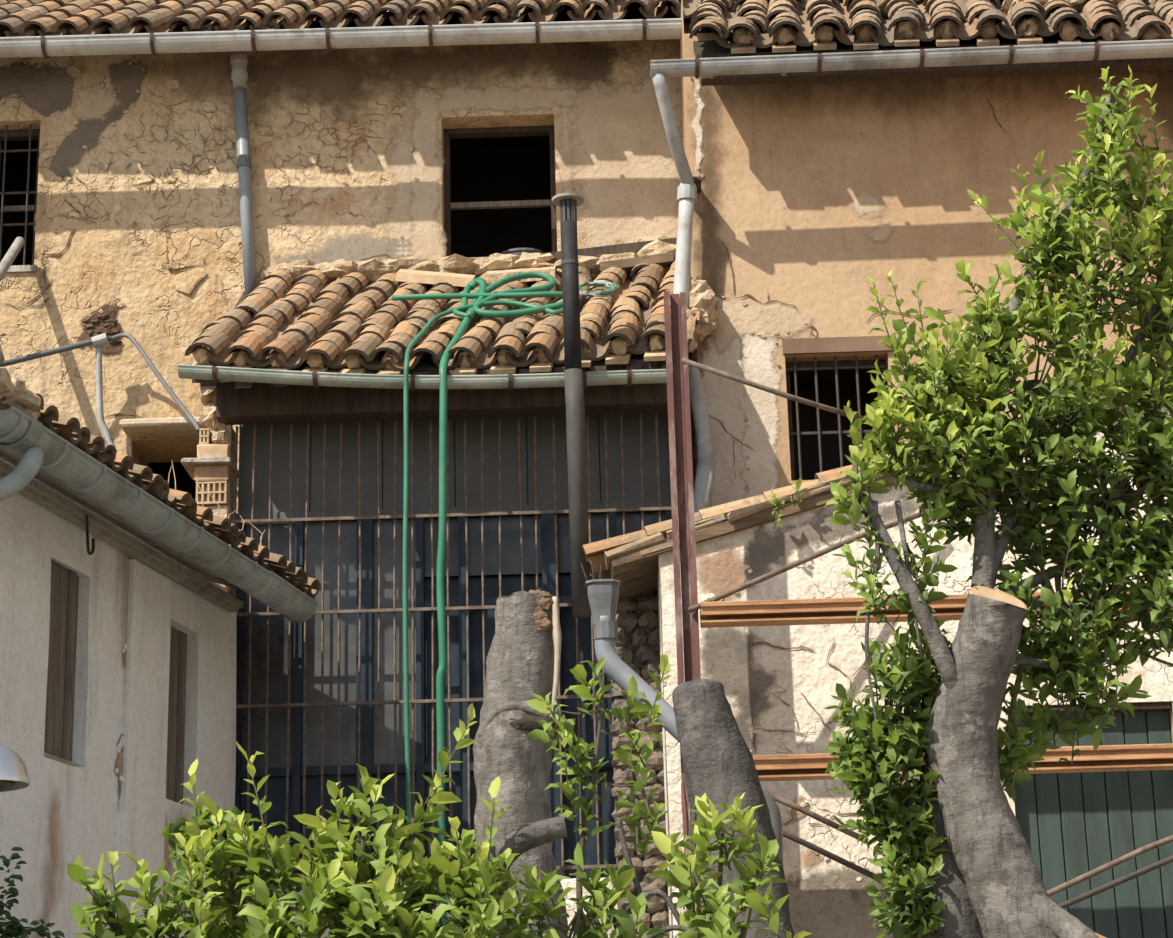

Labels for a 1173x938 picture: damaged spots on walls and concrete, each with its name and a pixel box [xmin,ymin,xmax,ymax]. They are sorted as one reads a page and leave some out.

peeling [0,60,148,181]
crack [6,77,231,309]
crack [255,97,413,230]
crack [360,253,395,261]
peeling [851,193,892,241]
crack [86,298,120,317]
peeling [680,276,811,507]
peeling [698,546,753,601]
damp [700,627,776,726]